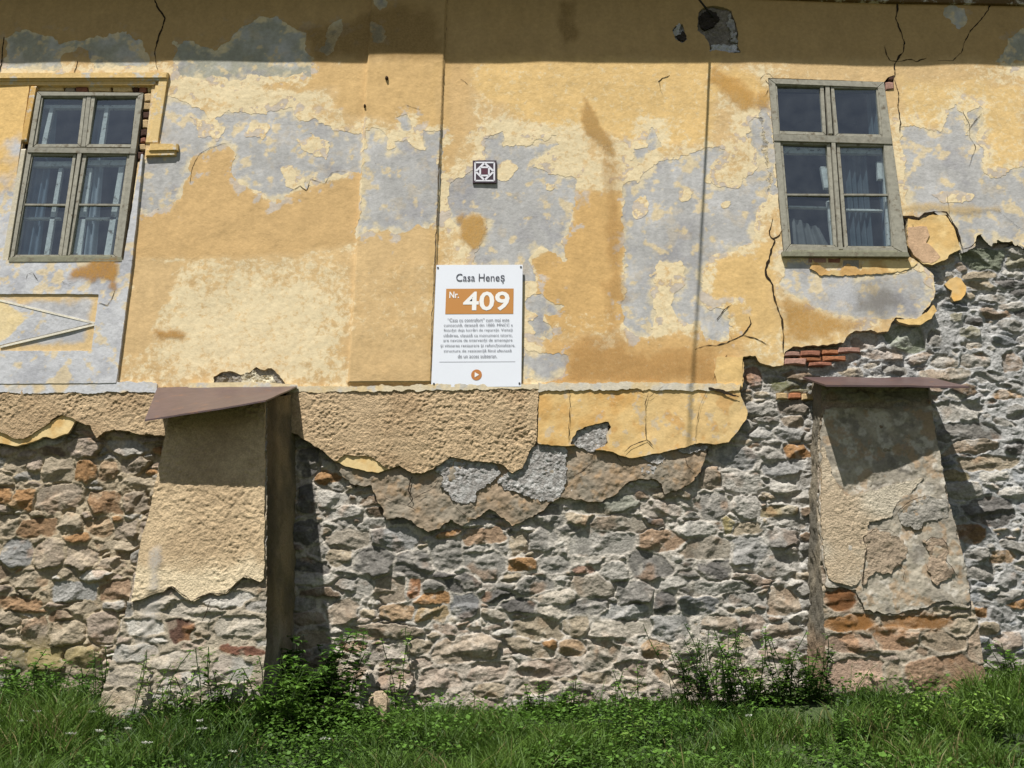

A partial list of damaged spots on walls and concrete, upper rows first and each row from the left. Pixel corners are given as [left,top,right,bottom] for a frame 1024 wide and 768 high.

peeling [4,29,150,72]
crack [154,0,166,70]
peeling [172,16,343,81]
crack [885,4,990,130]
damp [582,103,613,154]
peeling [38,87,577,282]
peeling [620,104,778,342]
peeling [779,104,1024,327]
crack [685,219,784,473]
crack [386,478,440,510]
spalling [332,422,710,533]
crack [571,387,662,478]